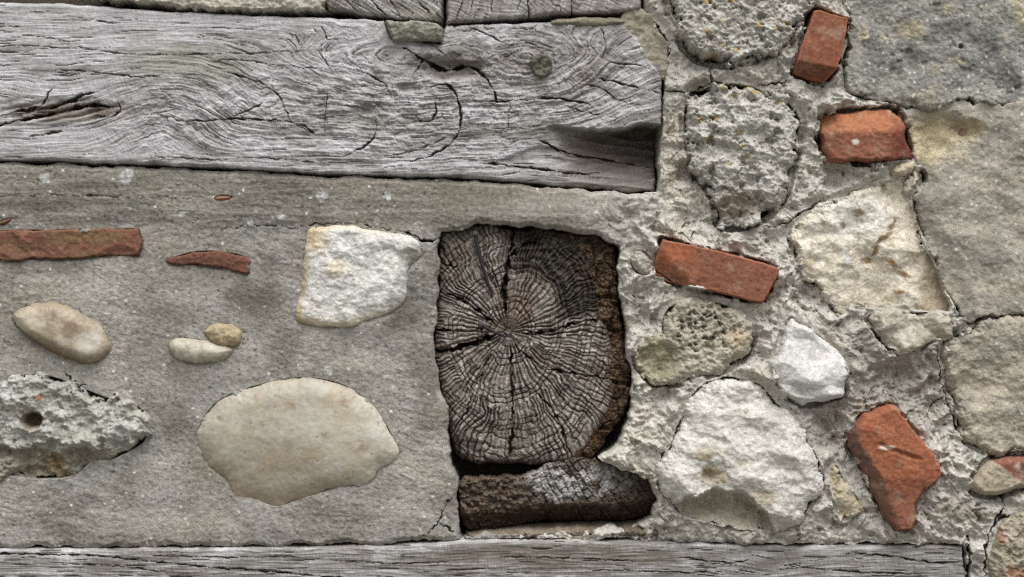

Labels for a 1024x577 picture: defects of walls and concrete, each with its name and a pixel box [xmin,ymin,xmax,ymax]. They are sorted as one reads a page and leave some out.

crack [515,556,747,574]
crack [803,494,1009,577]